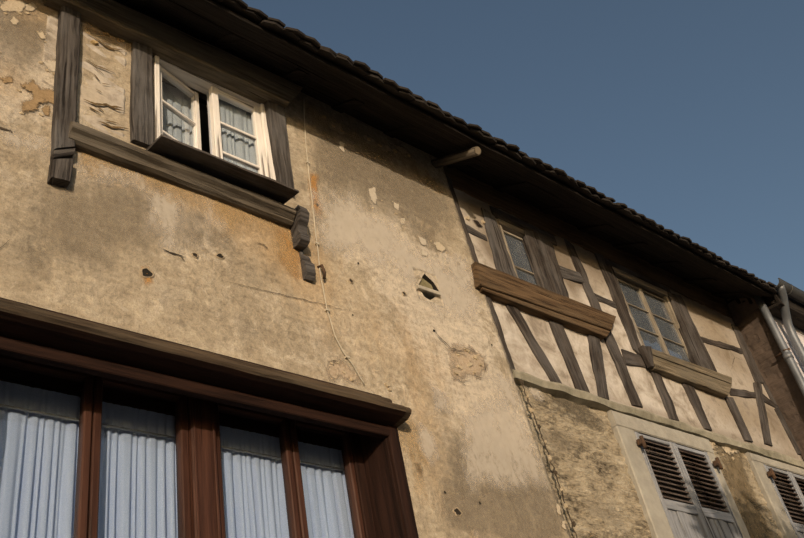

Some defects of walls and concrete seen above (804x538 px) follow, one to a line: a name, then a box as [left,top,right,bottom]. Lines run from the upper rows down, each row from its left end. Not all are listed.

peeling [0,0,37,25]
peeling [0,76,54,117]
spalling [449,343,488,380]
crack [519,379,578,538]